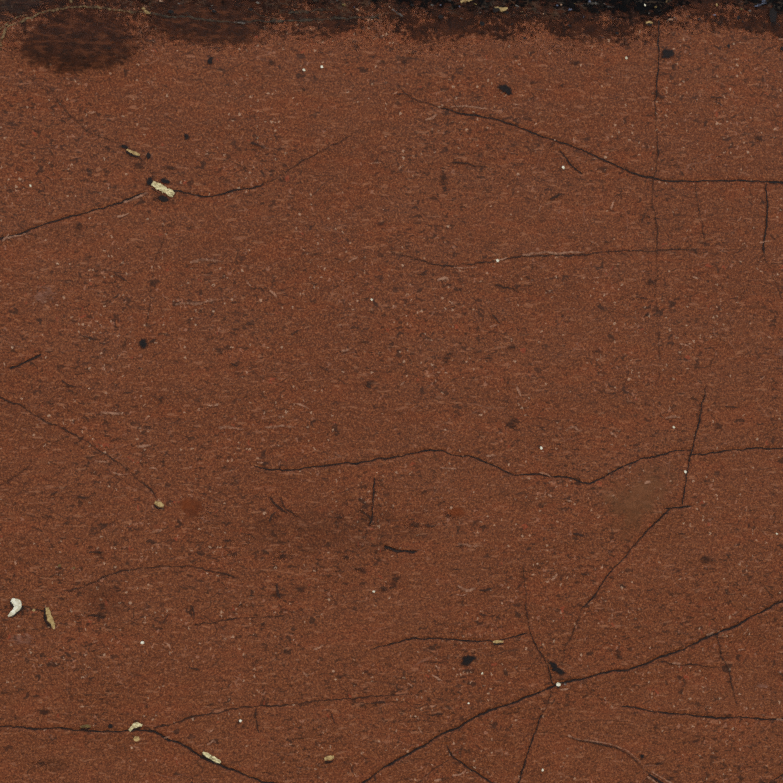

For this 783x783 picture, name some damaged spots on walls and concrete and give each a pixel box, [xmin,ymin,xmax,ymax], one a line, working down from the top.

damp [0,0,783,73]
crack [173,136,349,197]
crack [393,20,783,272]
crack [0,193,144,241]
crack [0,396,156,497]
crack [255,389,783,654]
crack [64,565,241,591]
crack [194,617,254,625]
crack [362,570,783,783]
crack [0,694,404,783]